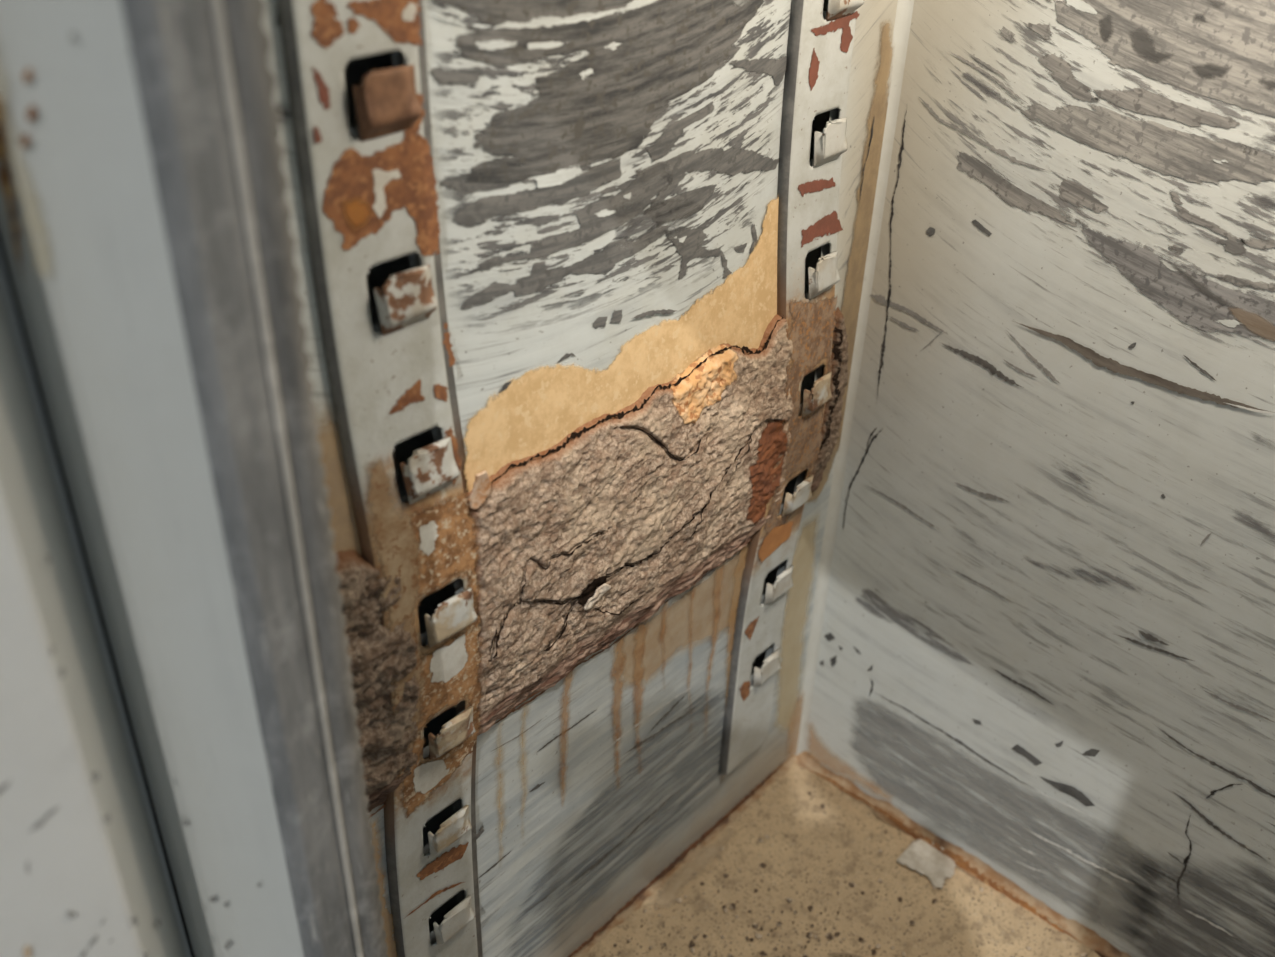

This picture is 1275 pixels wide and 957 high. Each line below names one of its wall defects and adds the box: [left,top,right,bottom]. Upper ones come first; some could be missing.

corrosion [310,0,423,49]
corrosion [322,93,440,256]
peeling [431,0,790,319]
corrosion [809,11,860,91]
peeling [940,0,1275,346]
spalling [1013,321,1275,414]
corrosion [398,426,482,818]
crack [495,689,547,724]
peeling [464,314,794,736]
crack [490,421,772,668]
corrosion [612,296,837,770]
crack [1141,784,1242,908]